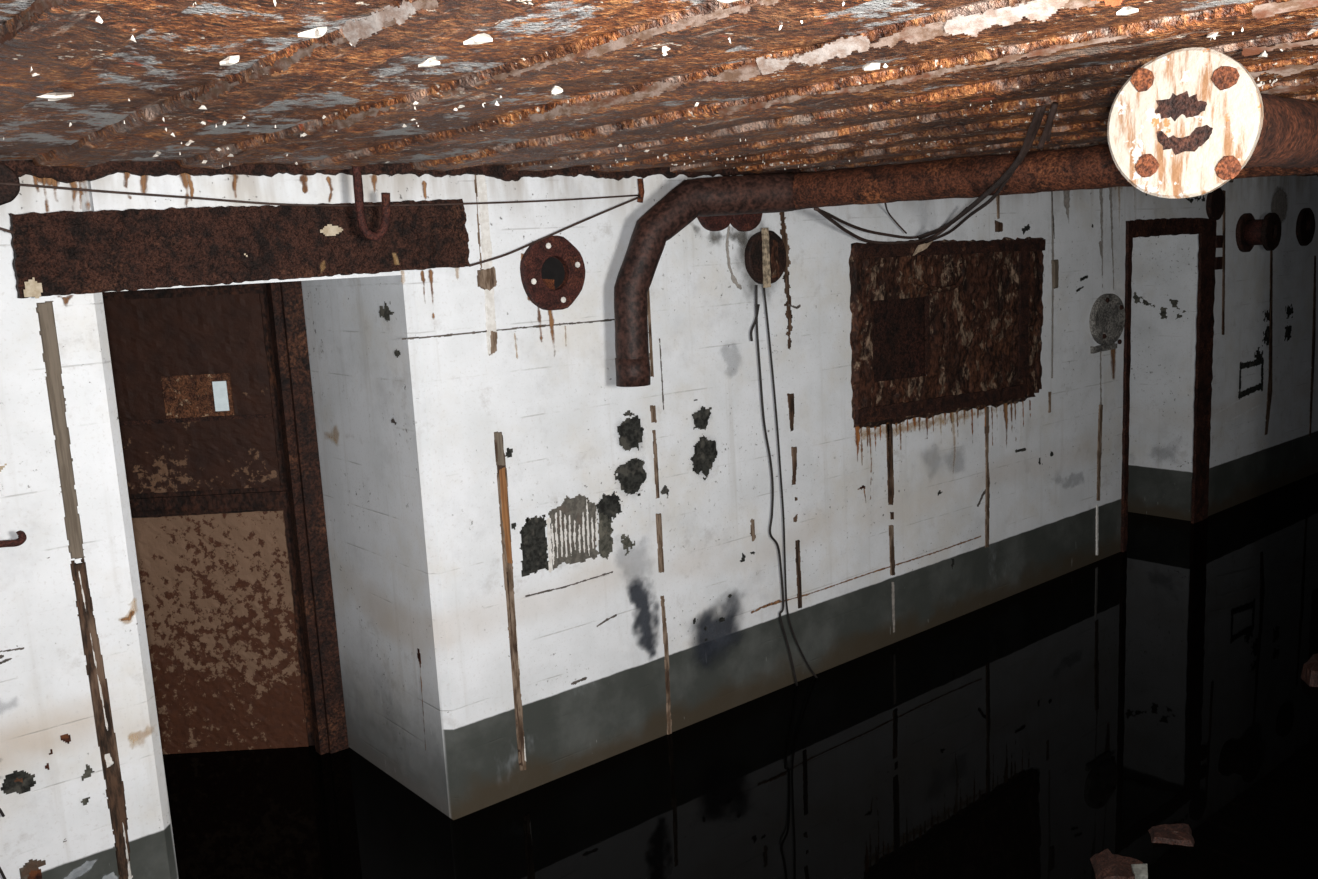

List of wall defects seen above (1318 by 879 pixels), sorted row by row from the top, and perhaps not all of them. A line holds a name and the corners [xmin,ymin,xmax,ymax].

rust [0,160,802,212]
peeling [690,399,718,480]
peeling [511,410,647,577]
spalling [1,734,71,795]